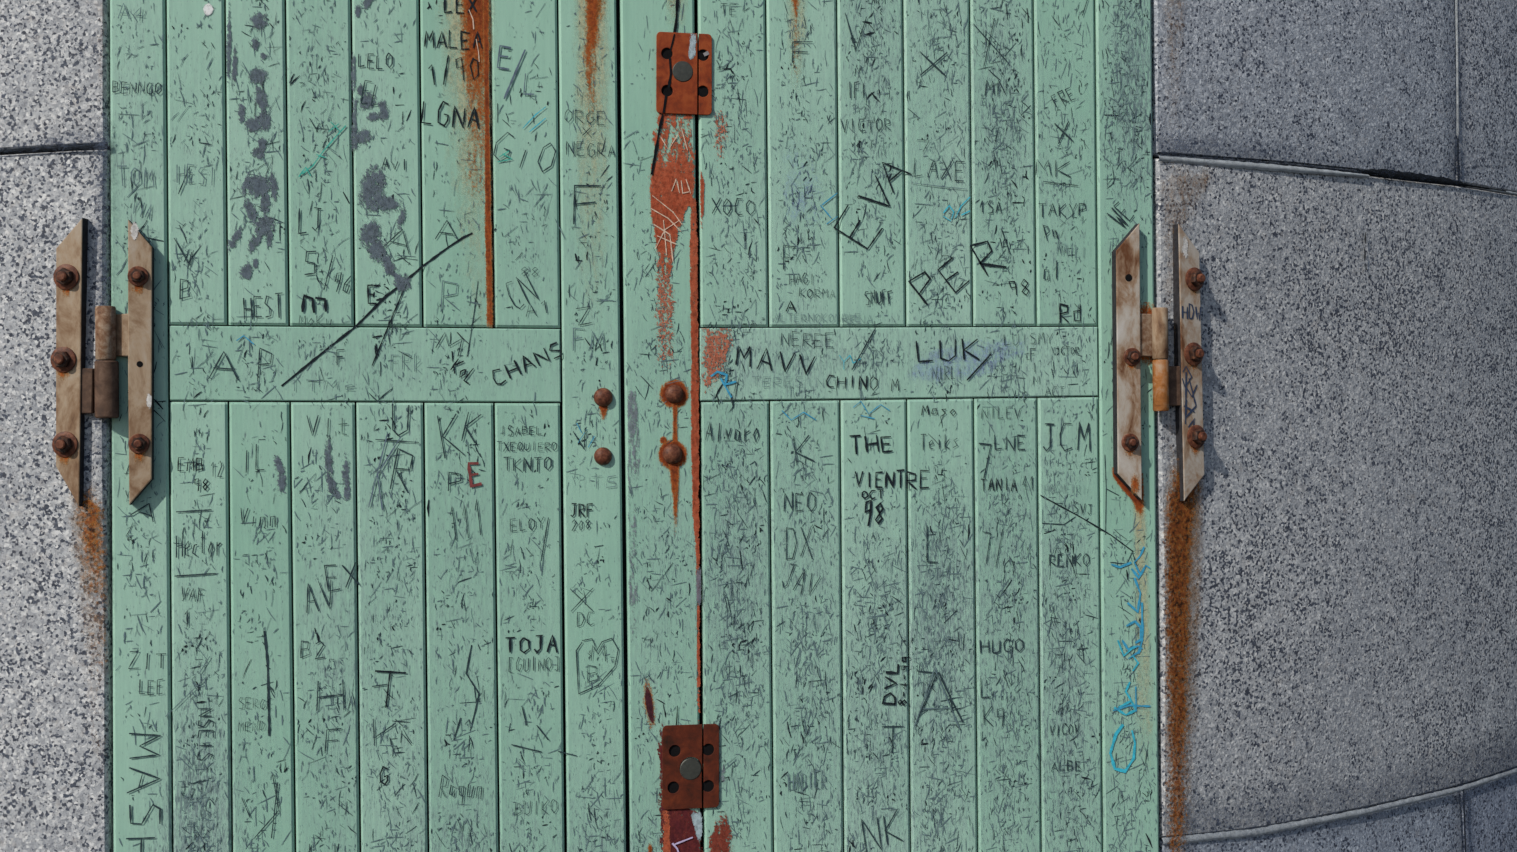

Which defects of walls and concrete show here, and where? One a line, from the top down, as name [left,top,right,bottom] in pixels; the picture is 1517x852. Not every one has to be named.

rust [445,0,493,327]
rust [578,0,606,208]
rust [658,379,689,523]
rust [1112,446,1203,852]